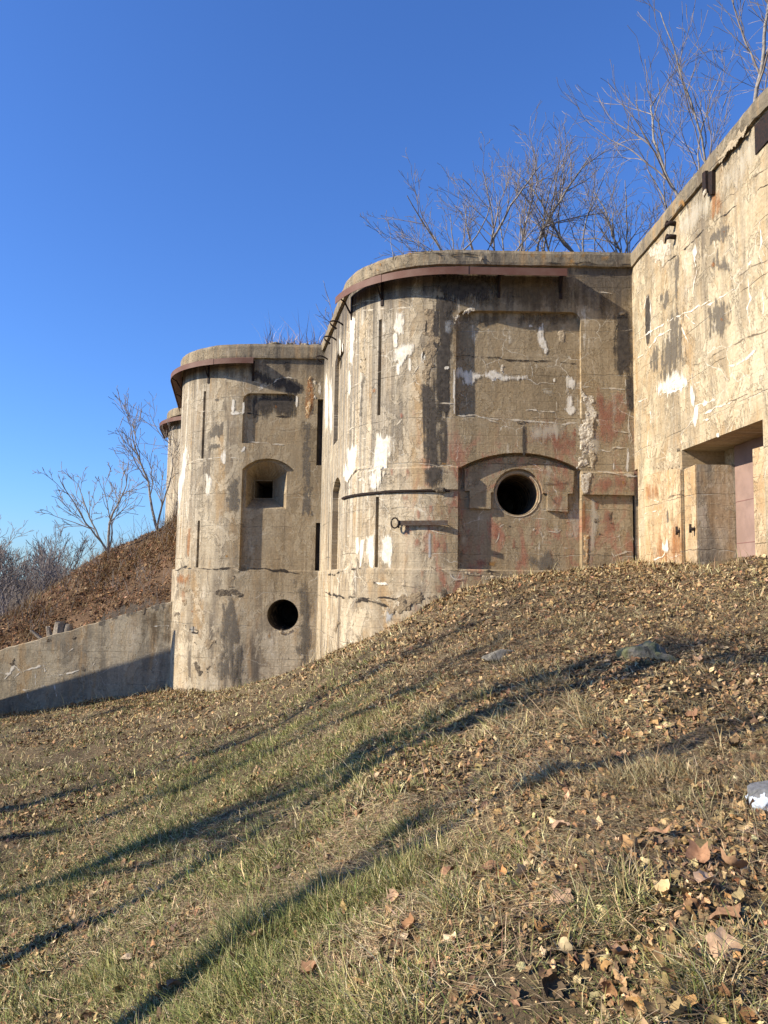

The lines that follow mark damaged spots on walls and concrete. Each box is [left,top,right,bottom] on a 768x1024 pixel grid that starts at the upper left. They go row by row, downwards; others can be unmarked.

crack [495,158,768,553]
leakage [645,238,699,426]
leakage [707,299,731,337]
crack [175,566,299,574]
leakage [217,597,245,683]